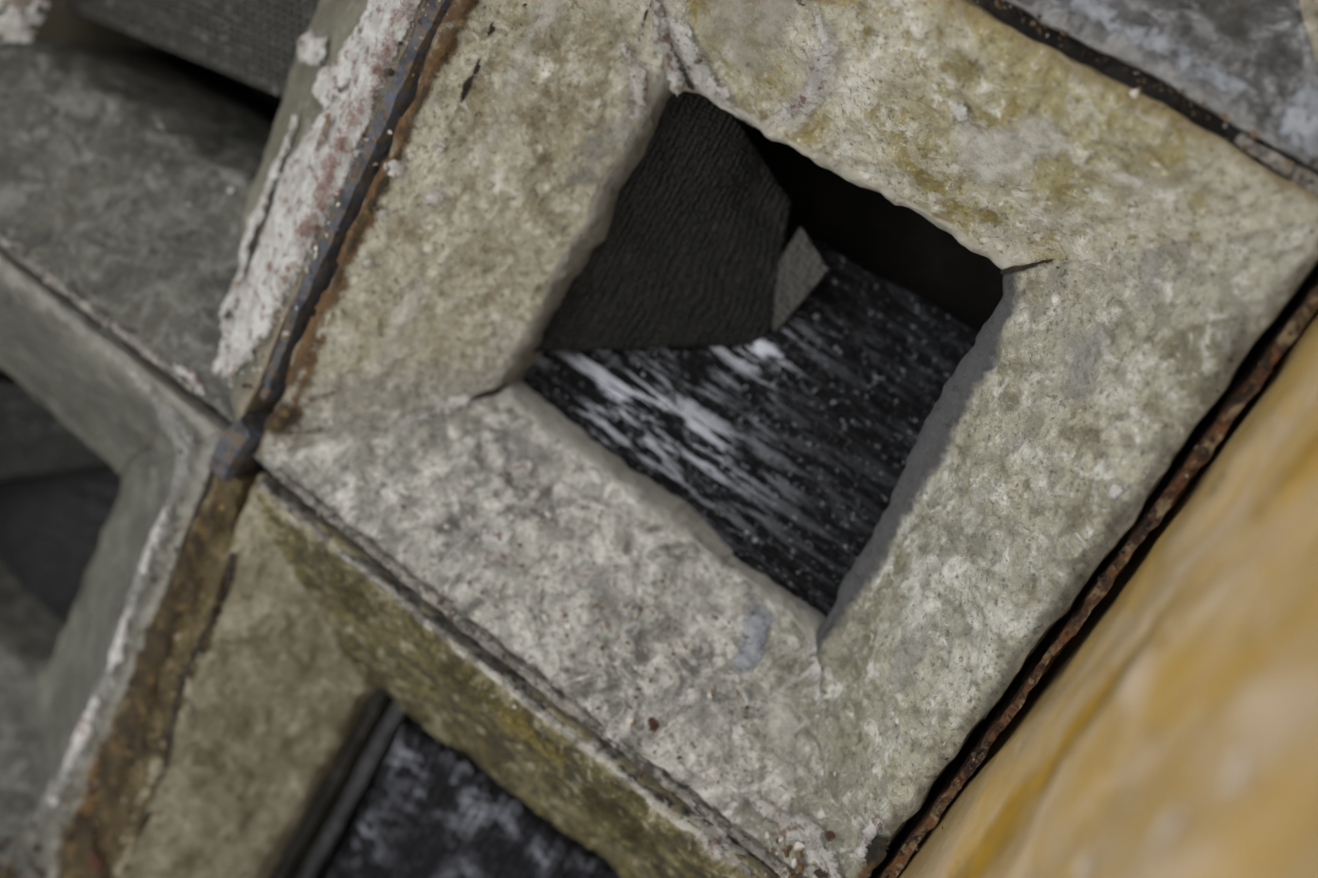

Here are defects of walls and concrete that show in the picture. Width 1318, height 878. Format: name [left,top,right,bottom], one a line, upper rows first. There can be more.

corrosion [263,0,479,436]
corrosion [54,514,223,878]
corrosion [873,271,1318,878]